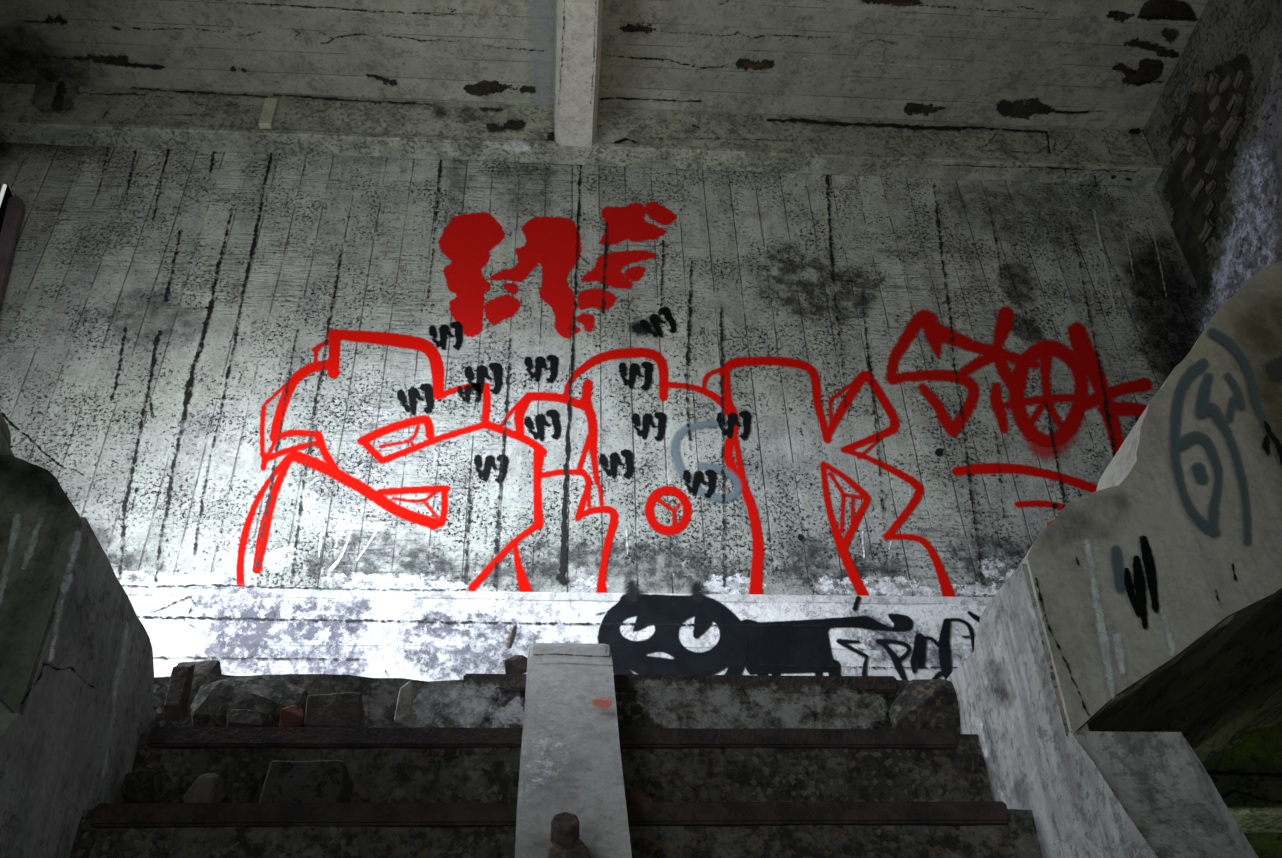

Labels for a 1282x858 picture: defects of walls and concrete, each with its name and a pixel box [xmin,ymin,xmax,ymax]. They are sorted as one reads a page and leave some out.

spalling [861,0,923,8]
spalling [735,58,777,71]
spalling [1107,0,1198,86]
spalling [463,80,536,133]
spalling [995,98,1101,120]
leakage [762,246,878,320]